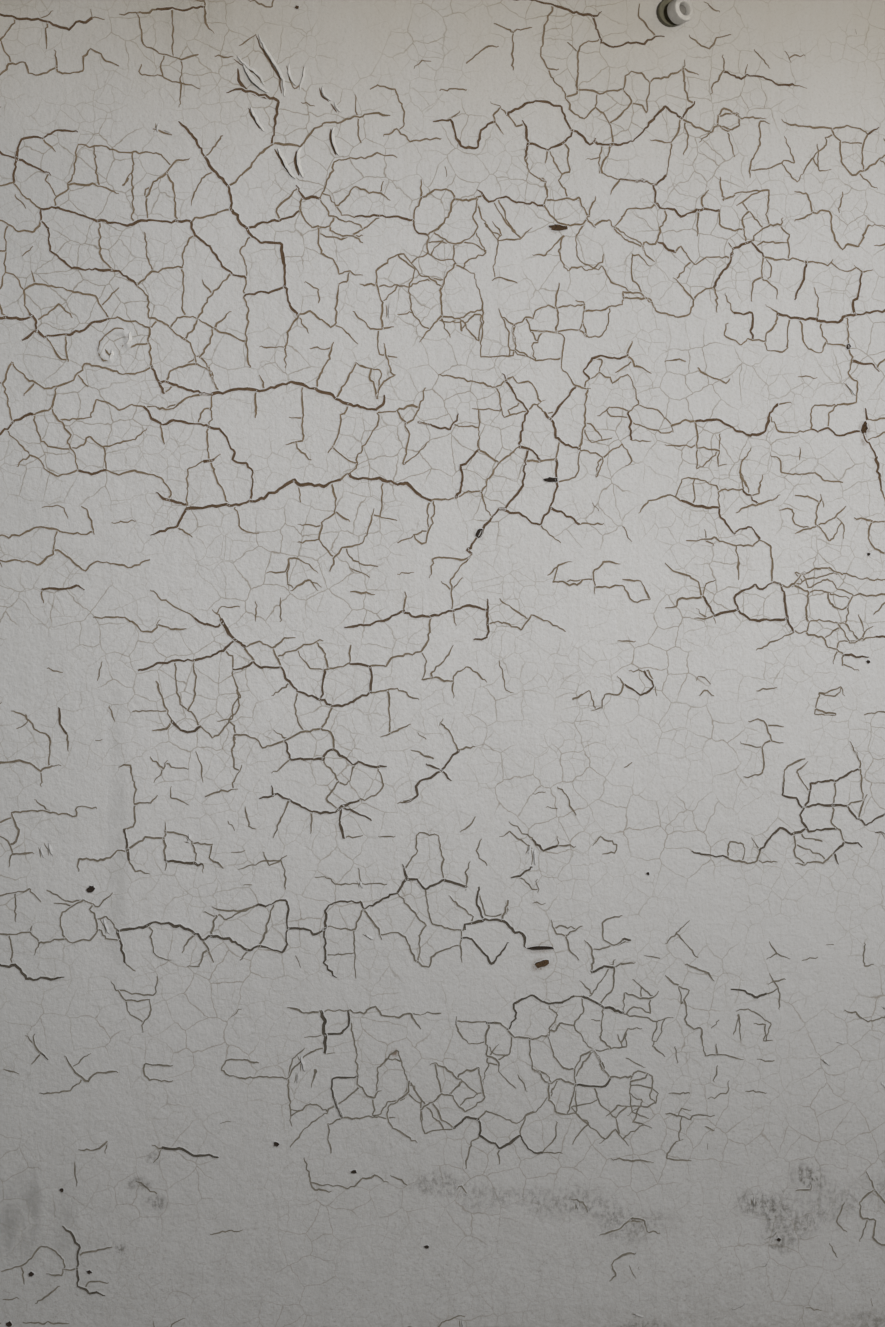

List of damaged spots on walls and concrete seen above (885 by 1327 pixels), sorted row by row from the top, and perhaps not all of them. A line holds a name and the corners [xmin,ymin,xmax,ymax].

peeling [234,34,306,132]
peeling [274,147,304,179]
peeling [319,87,341,156]
crack [0,0,885,1033]
crack [220,822,834,1194]
crack [3,1033,174,1095]
crack [74,1140,108,1186]
crack [136,1121,230,1194]
crack [0,1225,113,1325]
crack [571,1199,660,1282]
crack [829,1161,885,1258]